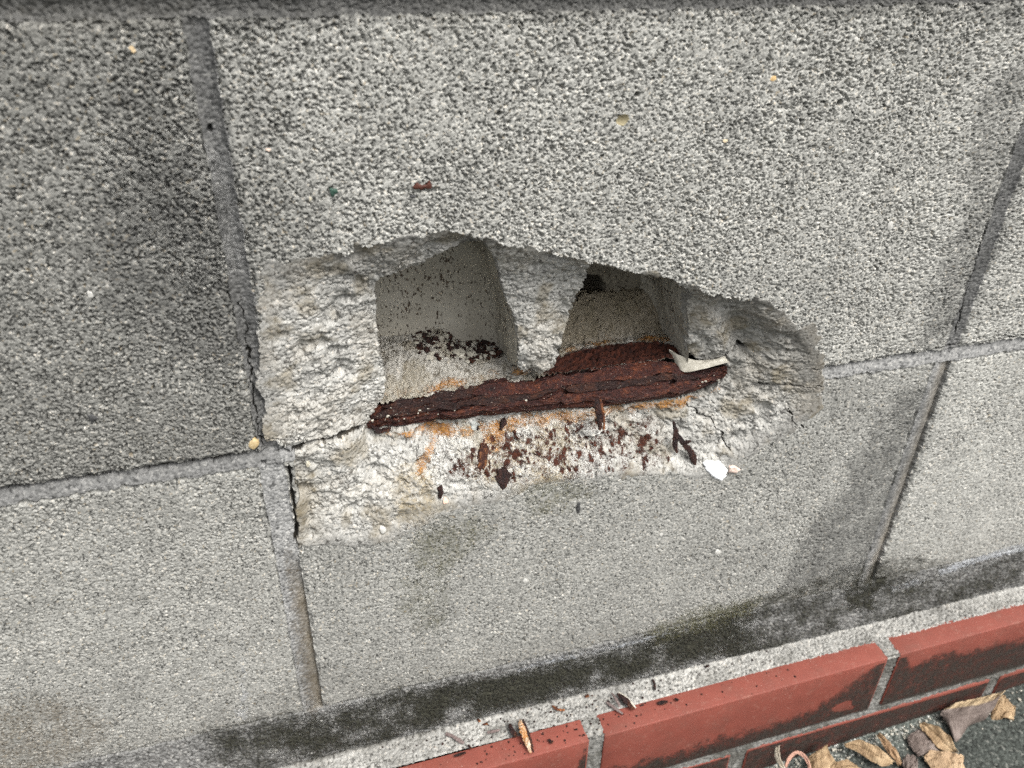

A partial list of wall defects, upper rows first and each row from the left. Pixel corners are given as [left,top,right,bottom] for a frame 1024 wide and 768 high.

crack [138,297,366,547]
spalling [255,229,826,548]
corrosion [366,336,728,499]
damp [200,472,1024,768]